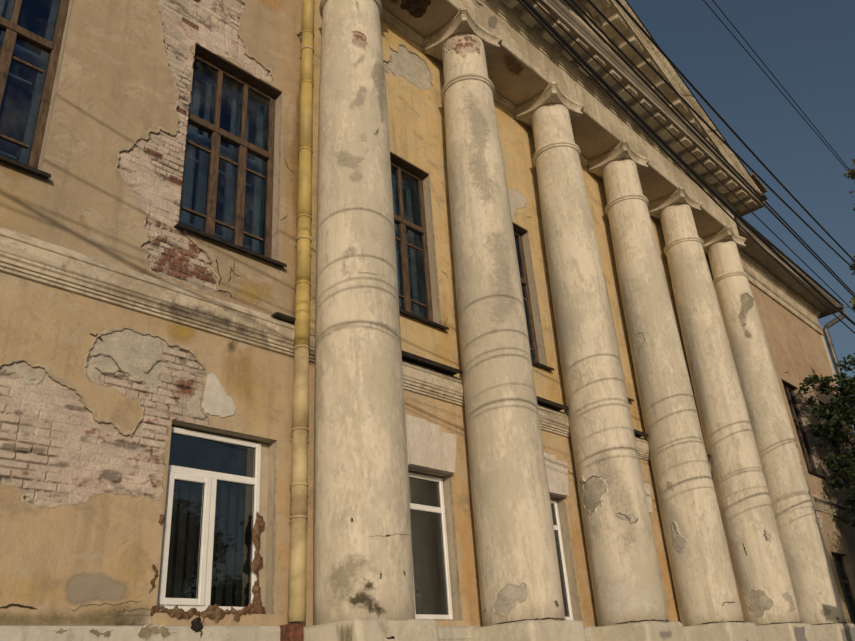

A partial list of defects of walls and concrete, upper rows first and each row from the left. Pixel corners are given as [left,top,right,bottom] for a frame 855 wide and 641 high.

flaking render [350,30,369,62]
flaking render [443,32,481,58]
flaking render [355,43,434,120]
flaking render [115,0,274,294]
crack [216,258,239,298]
peeling [739,293,754,338]
flaking render [0,325,213,509]
flaking render [579,476,609,515]
spalling [87,511,265,641]
water stain [333,560,384,615]
flaking render [484,581,529,618]
flaking render [750,588,795,619]